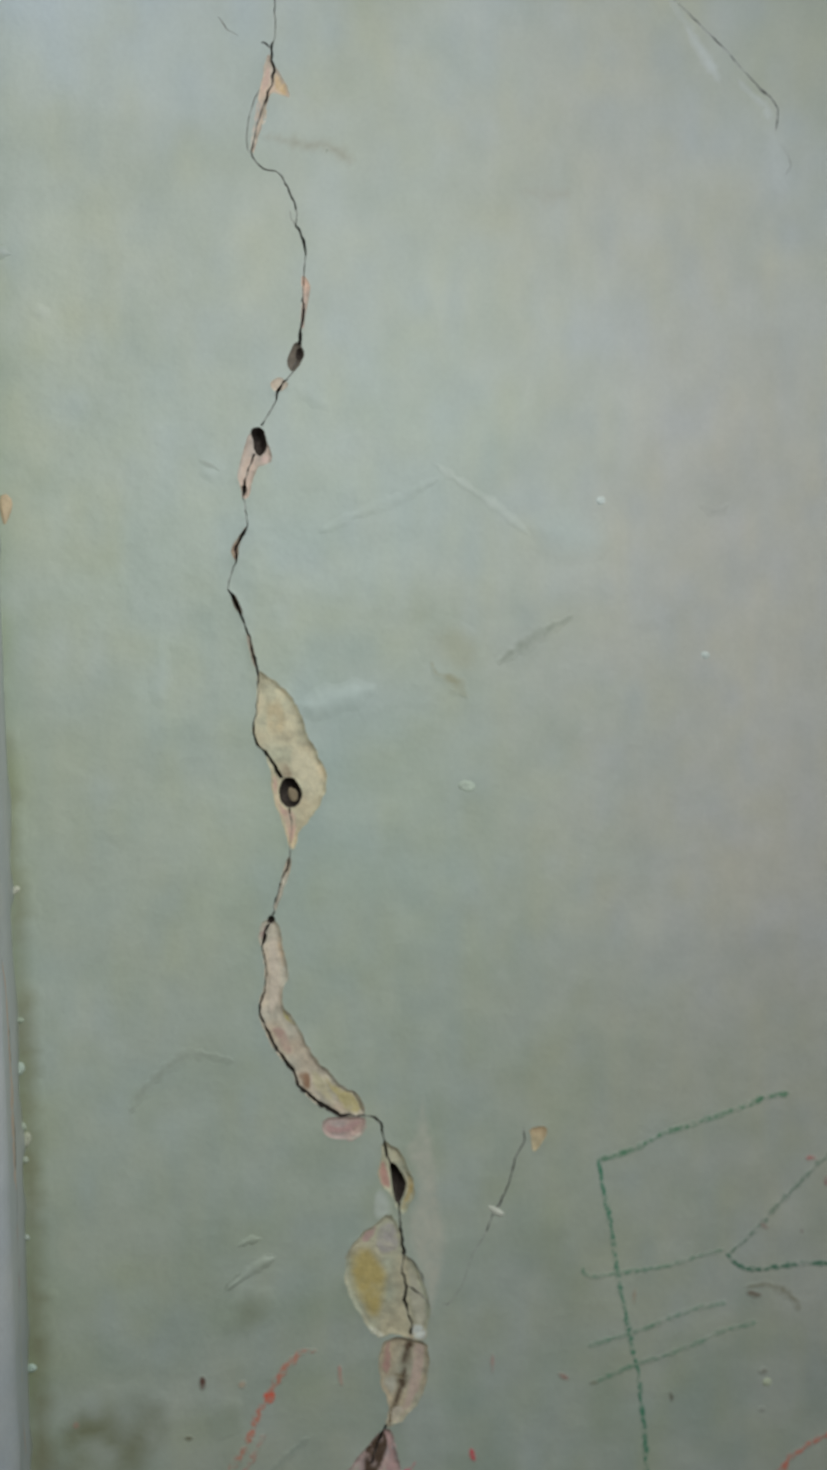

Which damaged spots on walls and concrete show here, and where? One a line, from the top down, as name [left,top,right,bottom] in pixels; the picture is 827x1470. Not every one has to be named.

crack [678,3,791,172]
crack [219,0,391,1162]
spalling [247,635,367,1141]
crack [369,1424,387,1464]
peeling [344,1090,450,1470]
crack [398,1126,525,1335]